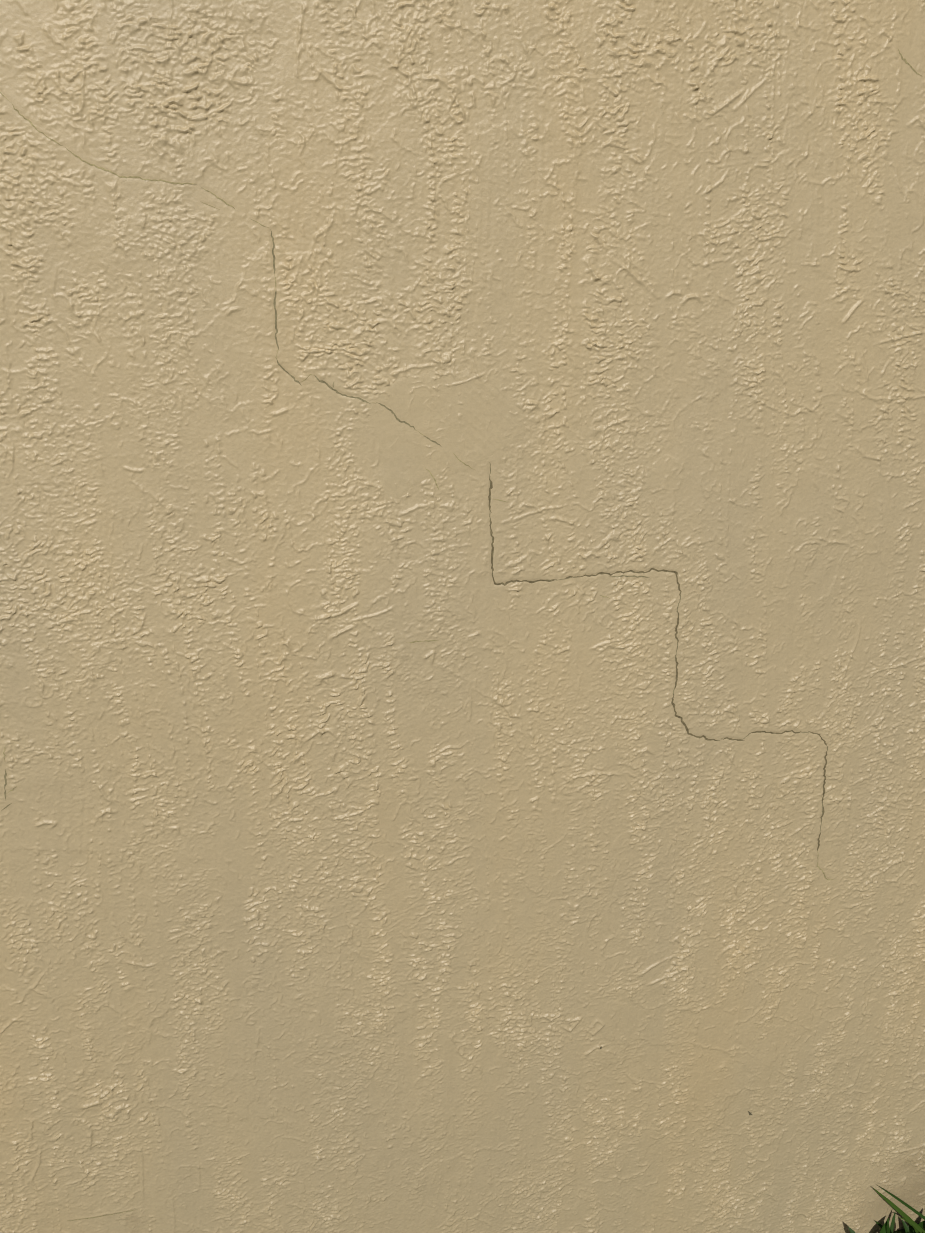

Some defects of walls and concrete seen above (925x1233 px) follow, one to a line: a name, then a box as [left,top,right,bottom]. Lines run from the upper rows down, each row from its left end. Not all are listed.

crack [0,92,833,881]